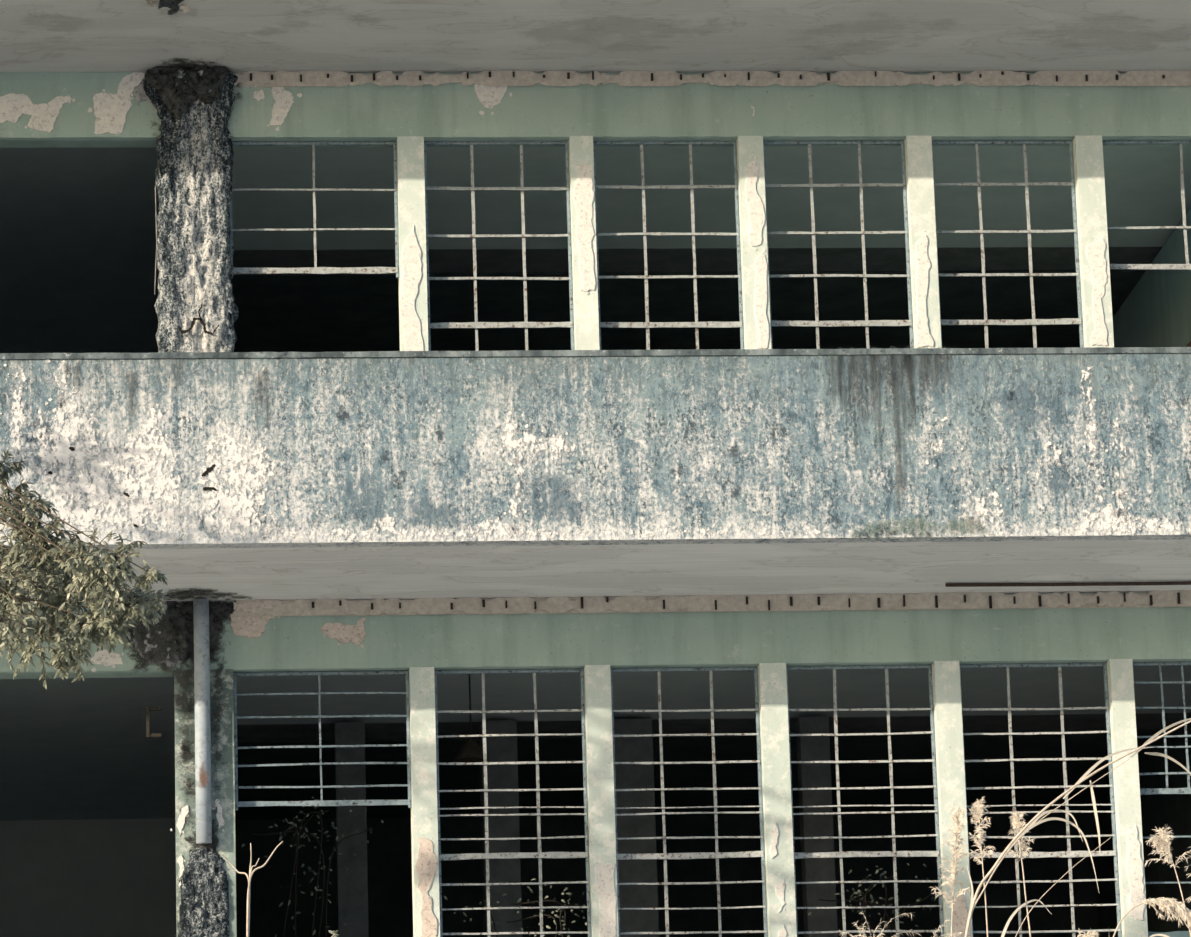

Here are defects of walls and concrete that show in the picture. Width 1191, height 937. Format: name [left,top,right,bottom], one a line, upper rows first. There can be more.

peeling [0,93,75,133]
spalling [88,59,302,138]
peeling [474,84,512,115]
water stain [829,347,951,501]
peeling [926,417,948,467]
peeling [988,367,1191,534]
peeling [944,480,1009,537]
spalling [89,587,280,672]
peeling [320,617,366,648]